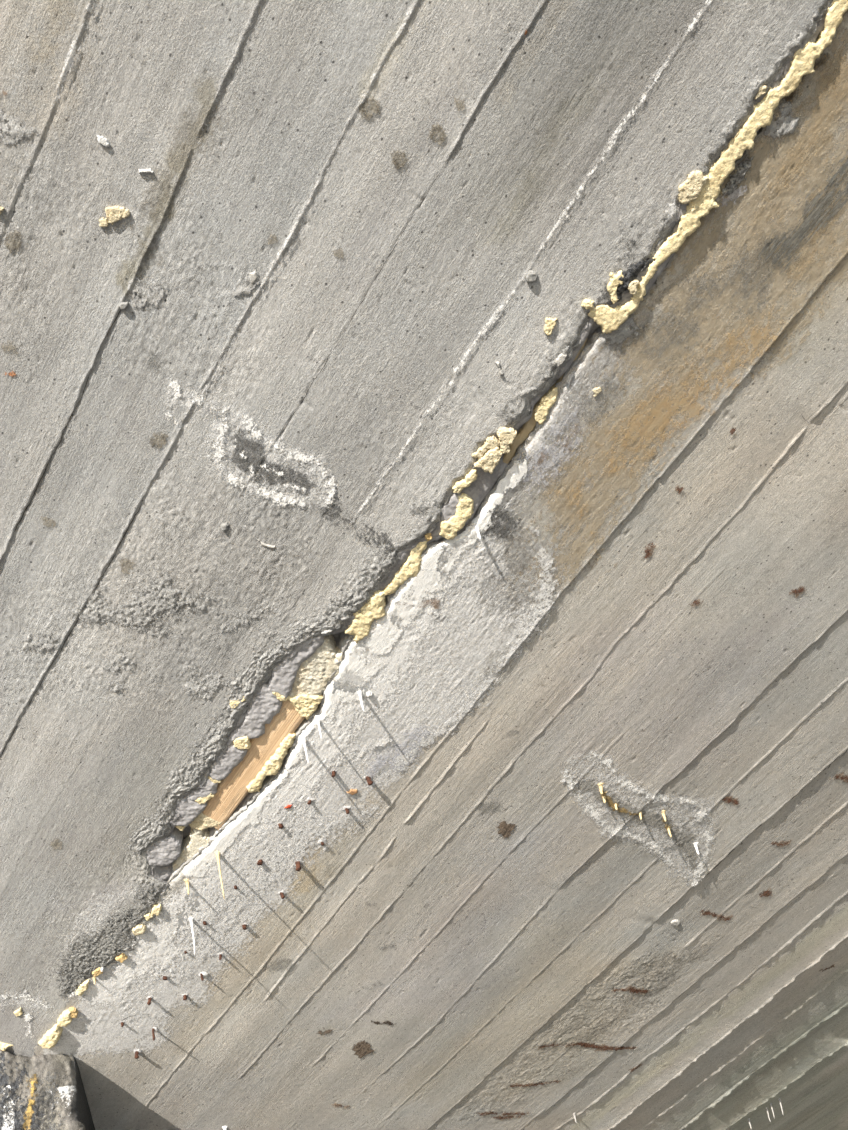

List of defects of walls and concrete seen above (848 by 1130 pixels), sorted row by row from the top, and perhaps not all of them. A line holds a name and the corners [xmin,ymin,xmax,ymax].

crack [757,15,825,103]
damp [127,278,168,308]
damp [149,0,712,557]
crack [330,201,689,650]
crack [0,506,141,757]
spalling [126,497,447,856]
crack [150,761,215,922]
damp [559,749,719,887]
damp [56,882,149,982]
corrosion [477,1111,529,1120]
corrosion [539,1042,636,1051]
corrosion [614,986,648,994]